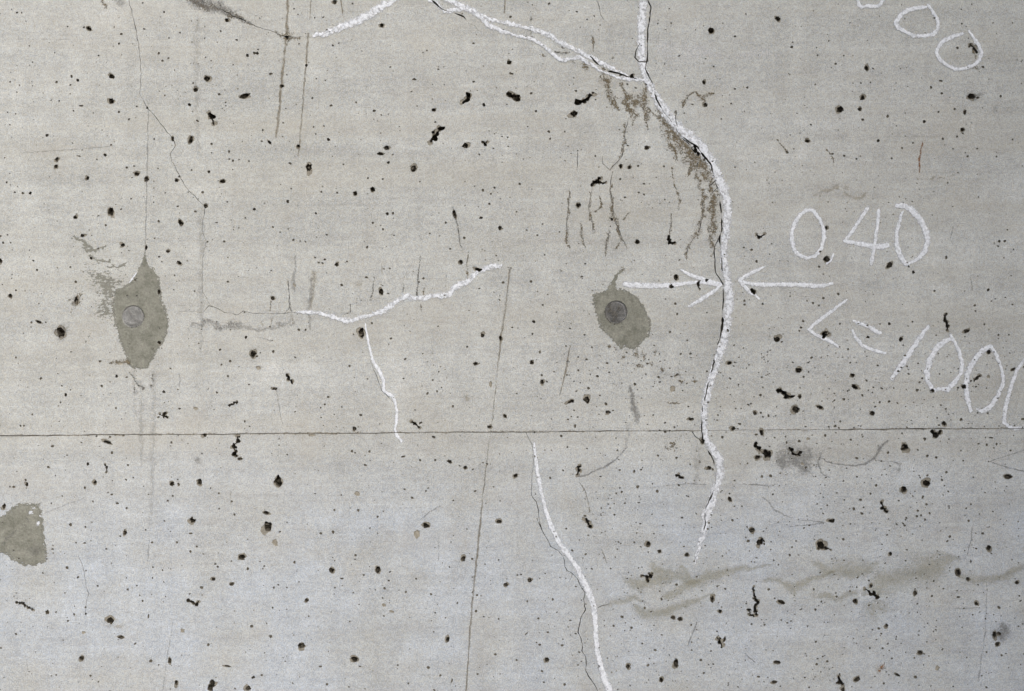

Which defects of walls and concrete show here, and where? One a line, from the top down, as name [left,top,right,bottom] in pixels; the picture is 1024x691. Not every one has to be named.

crack [566,122,628,247]
crack [590,1,724,562]
crack [526,433,608,691]